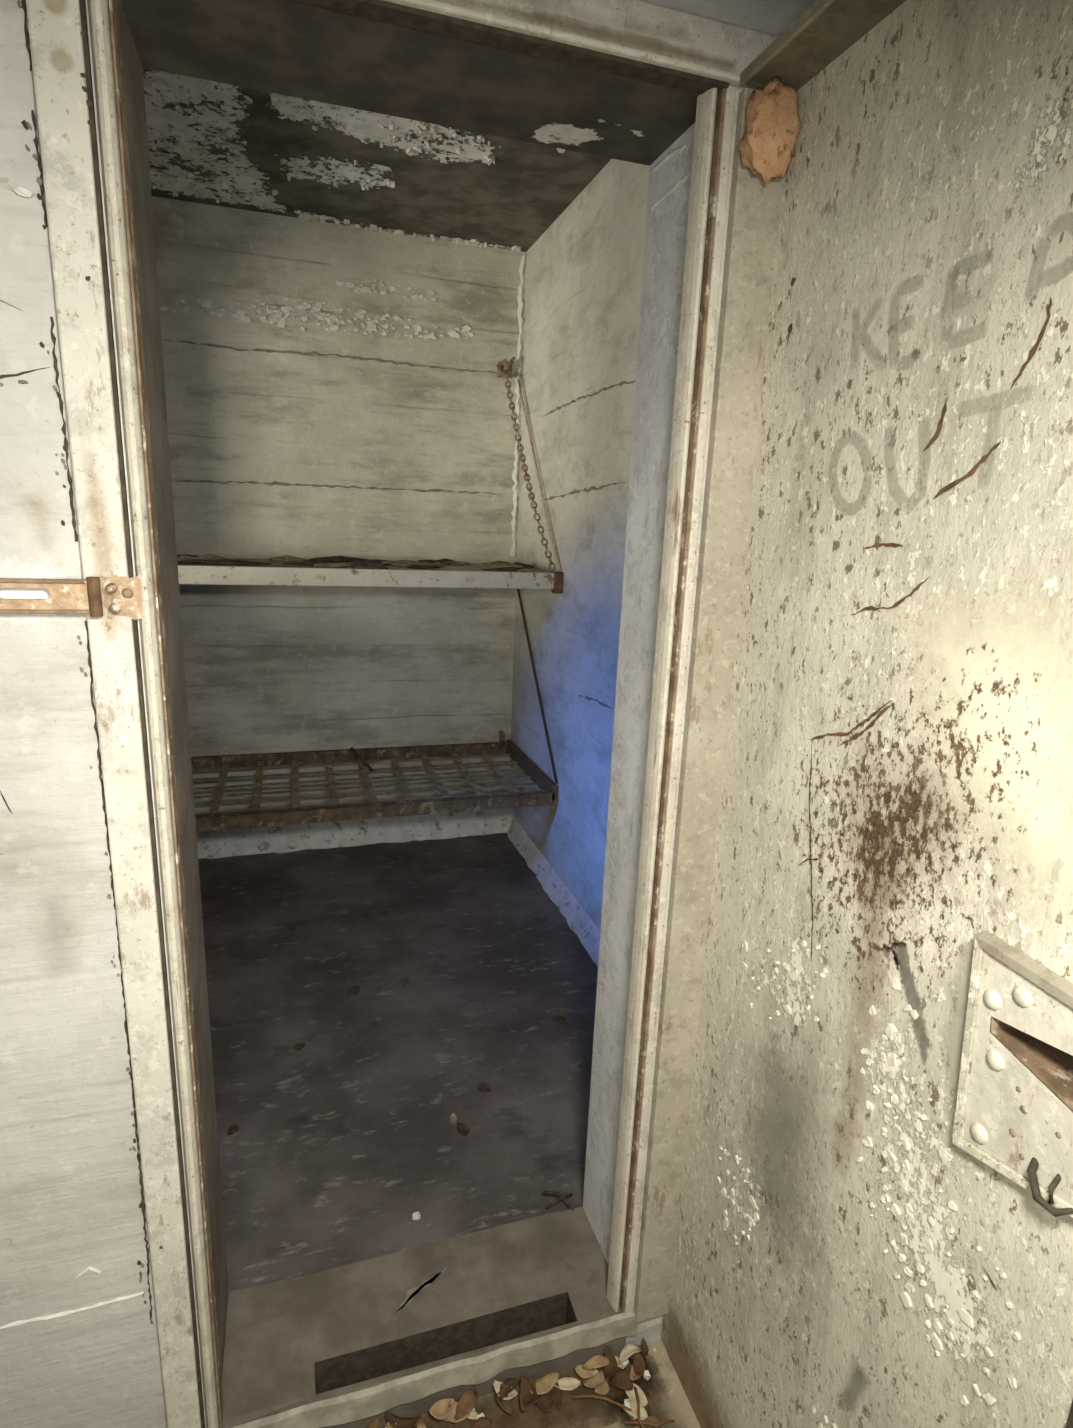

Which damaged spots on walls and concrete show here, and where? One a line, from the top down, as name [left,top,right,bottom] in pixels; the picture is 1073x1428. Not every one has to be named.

peeling [143,69,521,252]
peeling [531,119,644,153]
crack [1011,297,1052,388]
crack [0,300,78,542]
crack [924,396,948,451]
crack [932,441,1001,500]